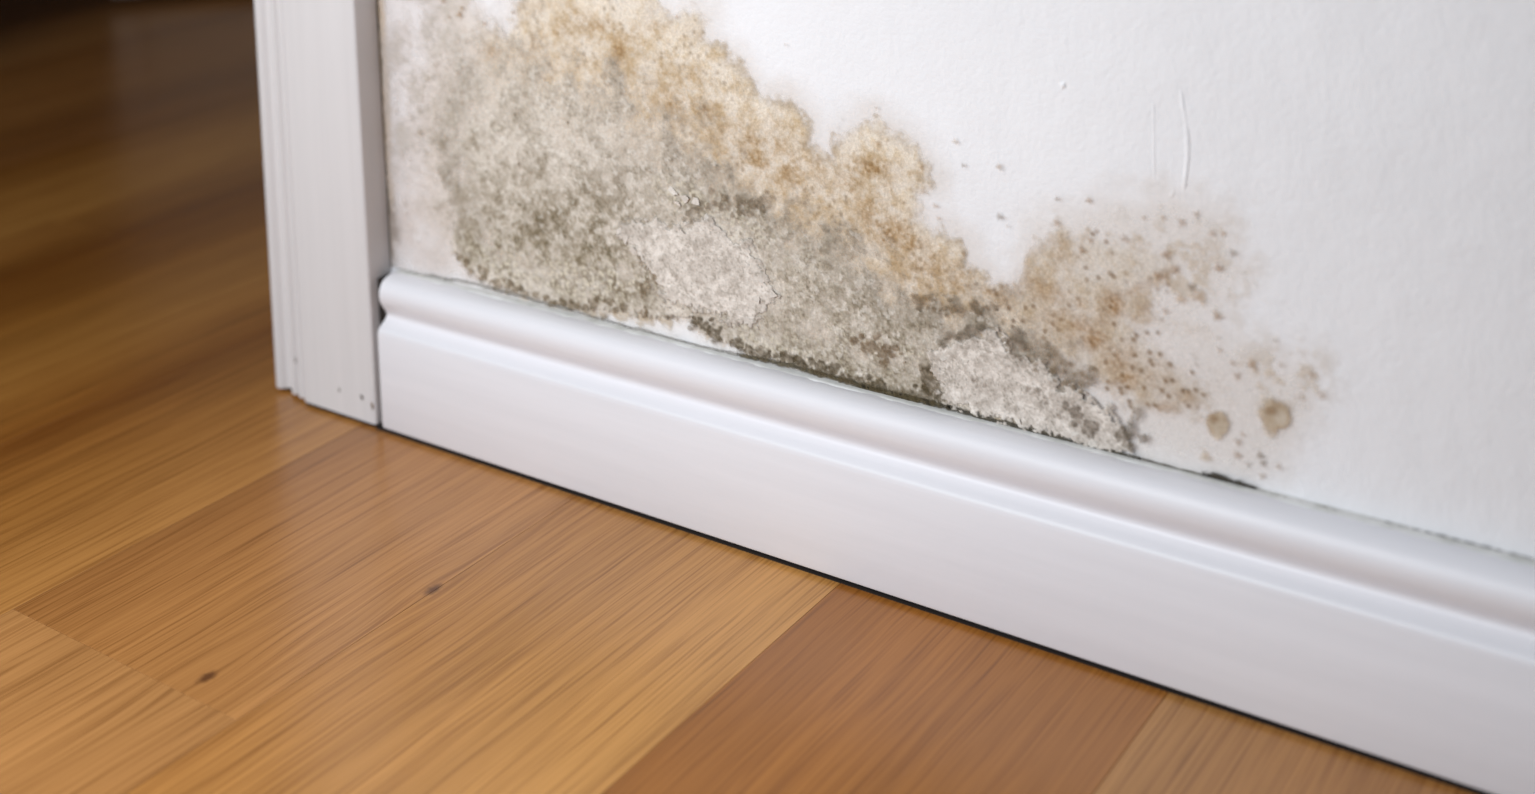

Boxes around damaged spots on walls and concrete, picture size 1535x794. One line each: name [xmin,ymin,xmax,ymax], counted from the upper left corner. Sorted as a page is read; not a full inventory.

leakage [378,0,1228,451]
leakage [1254,362,1307,434]